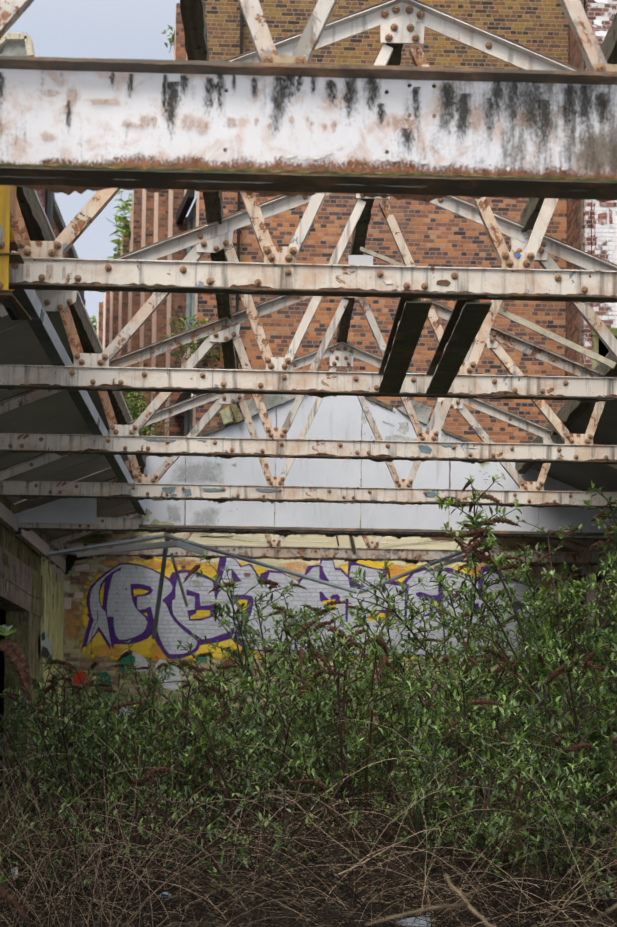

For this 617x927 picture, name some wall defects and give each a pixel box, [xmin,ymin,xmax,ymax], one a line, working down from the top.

peeling [593,19,607,41]
leakage [161,75,189,134]
leakage [204,74,236,113]
leakage [268,75,316,134]
leakage [326,78,386,123]
leakage [402,128,415,154]
leakage [411,87,421,118]
leakage [439,81,471,140]
leakage [486,81,617,173]
corrosion [39,154,617,178]
peeling [598,202,616,227]